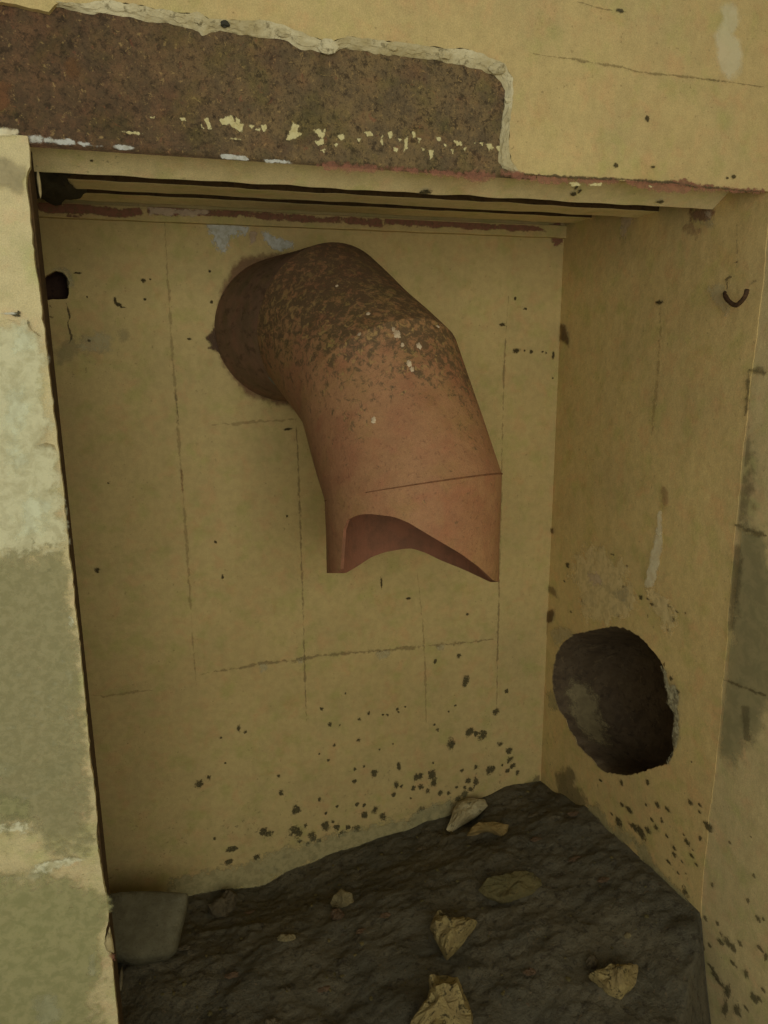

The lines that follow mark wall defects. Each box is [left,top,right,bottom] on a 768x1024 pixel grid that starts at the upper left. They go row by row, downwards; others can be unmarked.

flaking render [56,0,765,204]
peeling [30,135,89,146]
corrosion [206,328,224,362]
efflorescence [645,512,662,586]
mould [434,724,487,750]
spalling [661,662,680,764]
water stain [169,742,519,896]
water stain [588,802,702,902]
mould [703,916,749,979]
mould [708,964,765,1017]